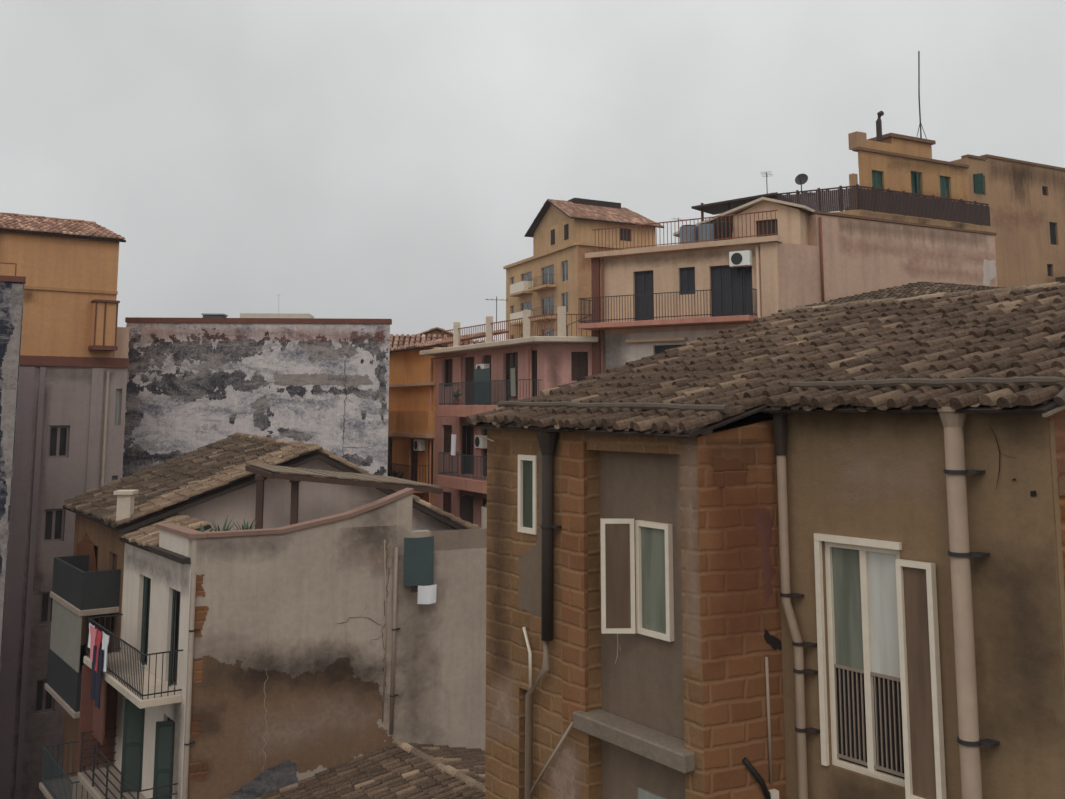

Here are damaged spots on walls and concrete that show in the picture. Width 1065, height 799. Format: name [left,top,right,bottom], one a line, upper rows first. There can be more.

peeling [258,329,388,365]
peeling [269,385,307,398]
peeling [0,284,23,654]